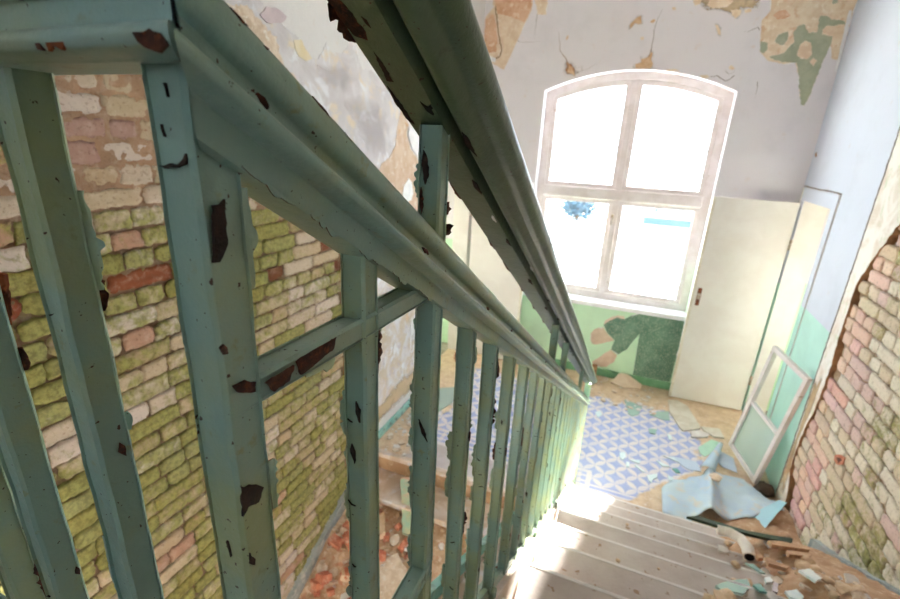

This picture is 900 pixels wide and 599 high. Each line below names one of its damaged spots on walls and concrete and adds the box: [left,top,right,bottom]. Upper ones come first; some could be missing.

peeling [224,0,419,211]
corrosion [327,0,371,40]
crack [559,41,595,76]
peeling [744,0,857,106]
flaking render [0,143,119,599]
flaking render [54,74,223,599]
corrosion [240,484,264,517]
corrosion [232,337,336,393]
flaking render [241,188,342,356]
flaking render [262,353,348,599]
peeling [590,314,685,382]
flaking render [788,227,900,590]